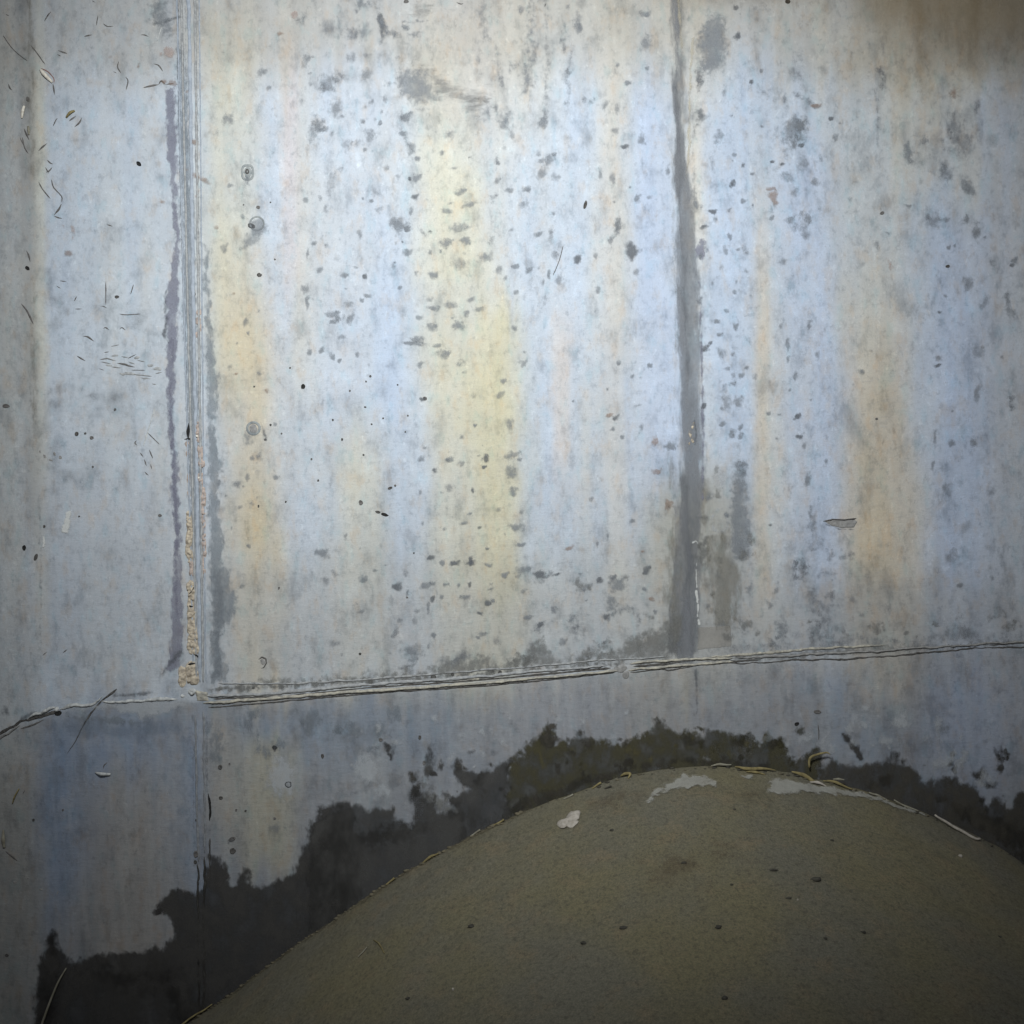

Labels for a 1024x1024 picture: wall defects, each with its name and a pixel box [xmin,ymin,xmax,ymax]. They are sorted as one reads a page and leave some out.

damp [672,0,721,88]
damp [166,91,176,167]
damp [162,203,179,399]
damp [578,102,721,664]
damp [168,421,182,549]
crack [0,689,182,752]
damp [167,581,183,671]
crack [208,660,695,708]
crack [731,643,1024,664]
damp [649,774,716,802]
damp [769,733,1024,863]
damp [35,739,511,1024]